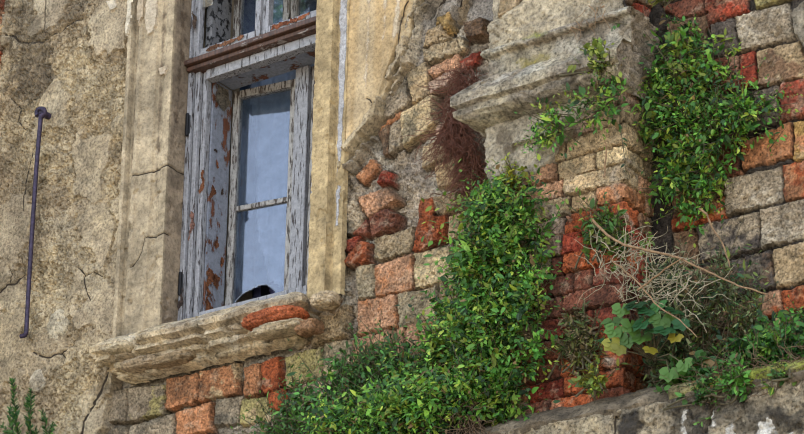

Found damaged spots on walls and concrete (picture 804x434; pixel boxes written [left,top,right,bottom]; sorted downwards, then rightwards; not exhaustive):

crack [81,372,109,434]
spalling [104,0,523,434]
crack [395,1,415,57]
spalling [475,0,804,423]